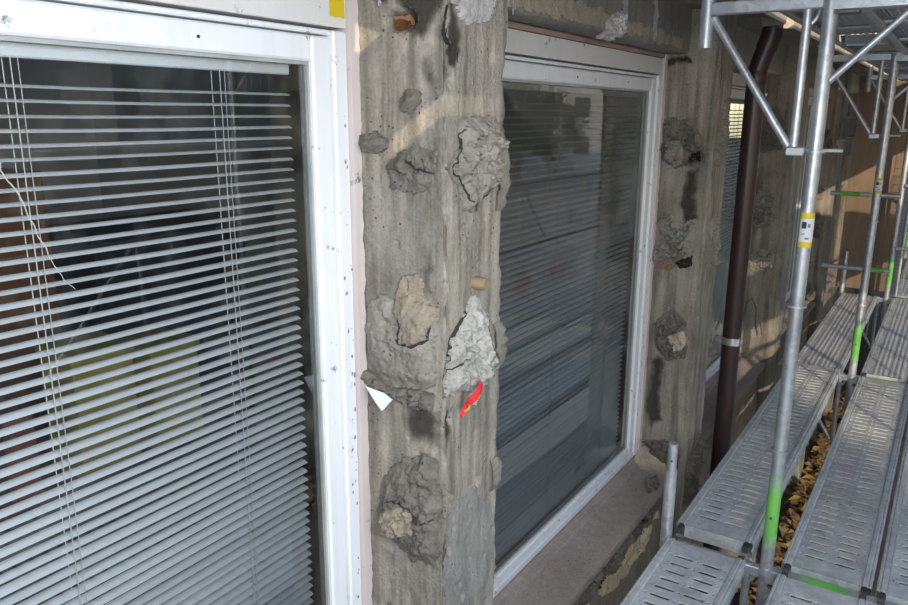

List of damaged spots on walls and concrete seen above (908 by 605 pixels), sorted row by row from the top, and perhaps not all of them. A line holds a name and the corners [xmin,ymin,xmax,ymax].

corrosion [393,13,418,32]
peeling [509,0,686,49]